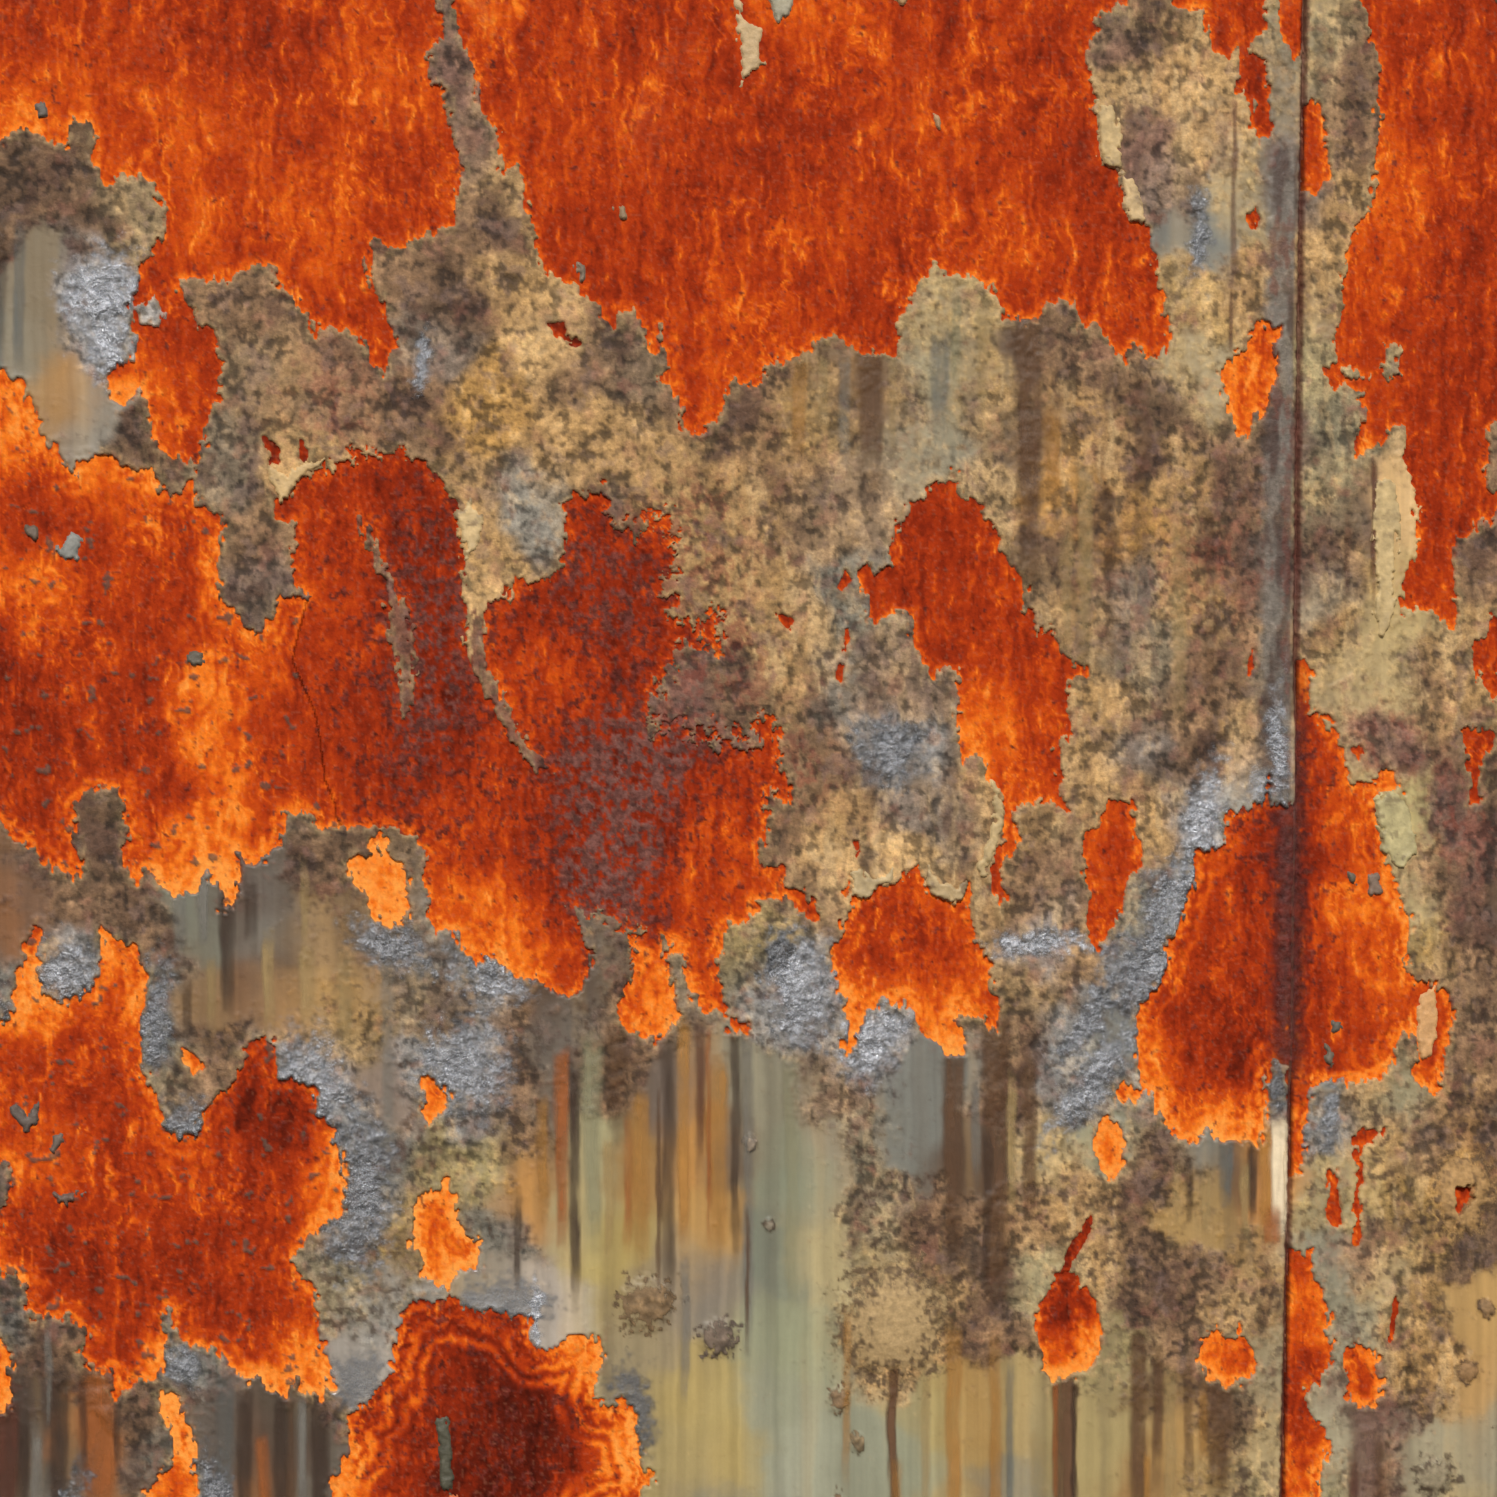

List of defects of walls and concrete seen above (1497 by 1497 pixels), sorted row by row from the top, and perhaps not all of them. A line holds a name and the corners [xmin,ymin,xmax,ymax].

peeling [1094,99,1145,225]
corrosion [1322,0,1497,630]
corrosion [0,0,1172,1057]
peeling [926,779,1005,902]
peeling [1001,757,1228,1131]
peeling [1249,705,1291,806]
corrosion [1093,658,1456,1181]
corrosion [0,925,349,1497]
water stain [540,1028,739,1273]
water stain [1225,1121,1288,1241]
water stain [887,1370,898,1497]
water stain [1053,1378,1076,1497]